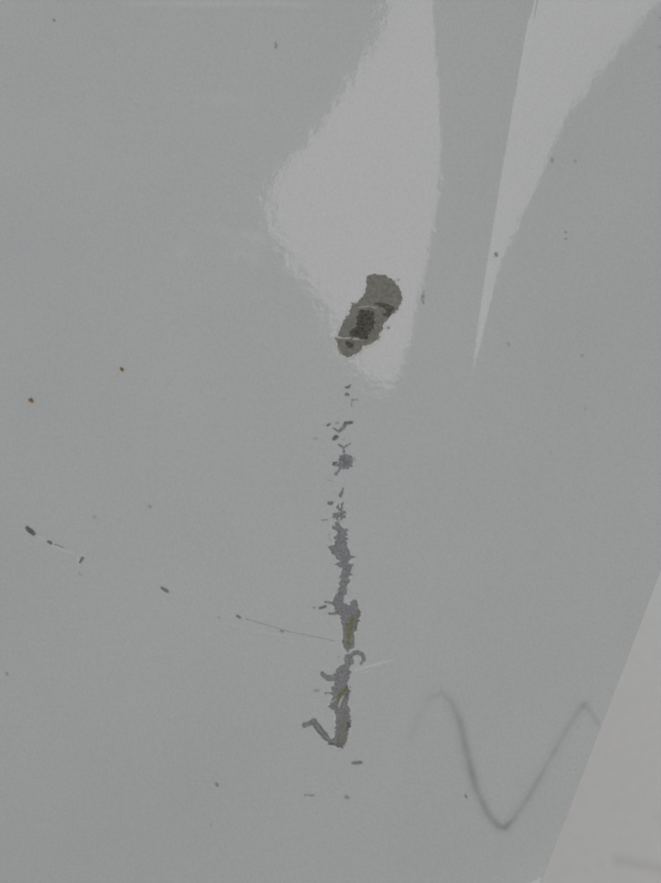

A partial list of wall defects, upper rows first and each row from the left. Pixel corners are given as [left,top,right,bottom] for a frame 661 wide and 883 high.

peeling [331,271,405,361]
peeling [325,420,354,442]
peeling [309,497,365,751]